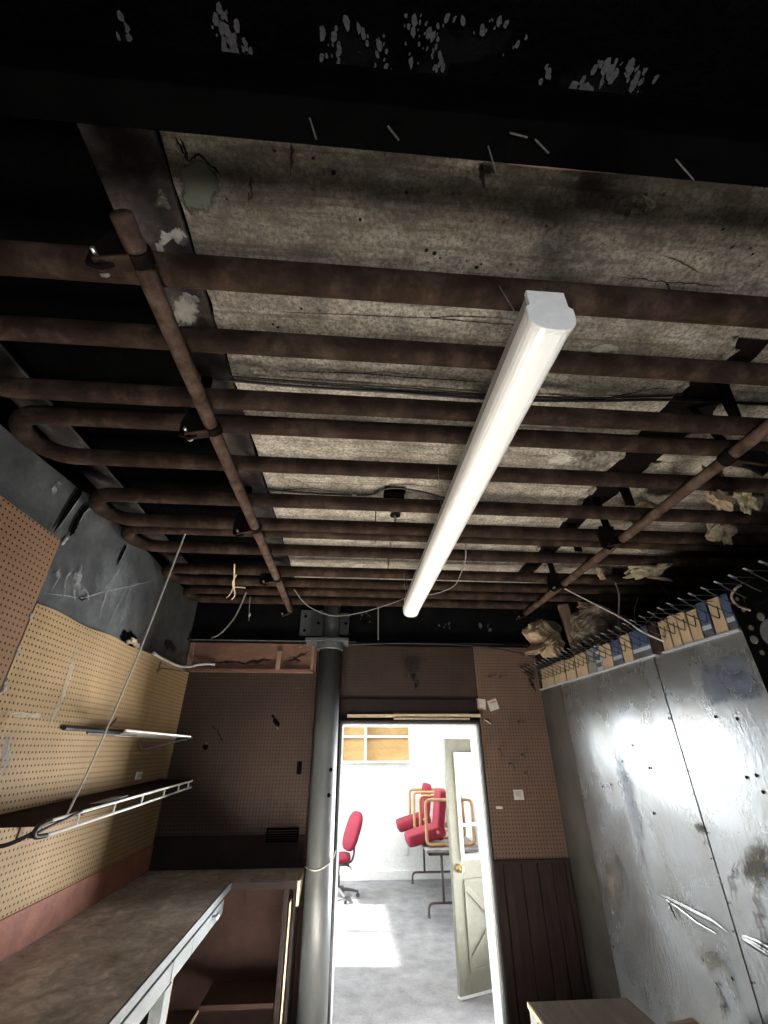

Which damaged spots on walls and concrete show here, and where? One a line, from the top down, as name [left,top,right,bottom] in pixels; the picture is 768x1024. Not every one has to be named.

peeling [116,10,133,42]
peeling [211,2,253,55]
peeling [319,15,392,70]
peeling [404,13,509,73]
peeling [569,57,660,93]
crack [176,138,221,177]
peeling [155,228,187,252]
peeling [174,292,200,326]